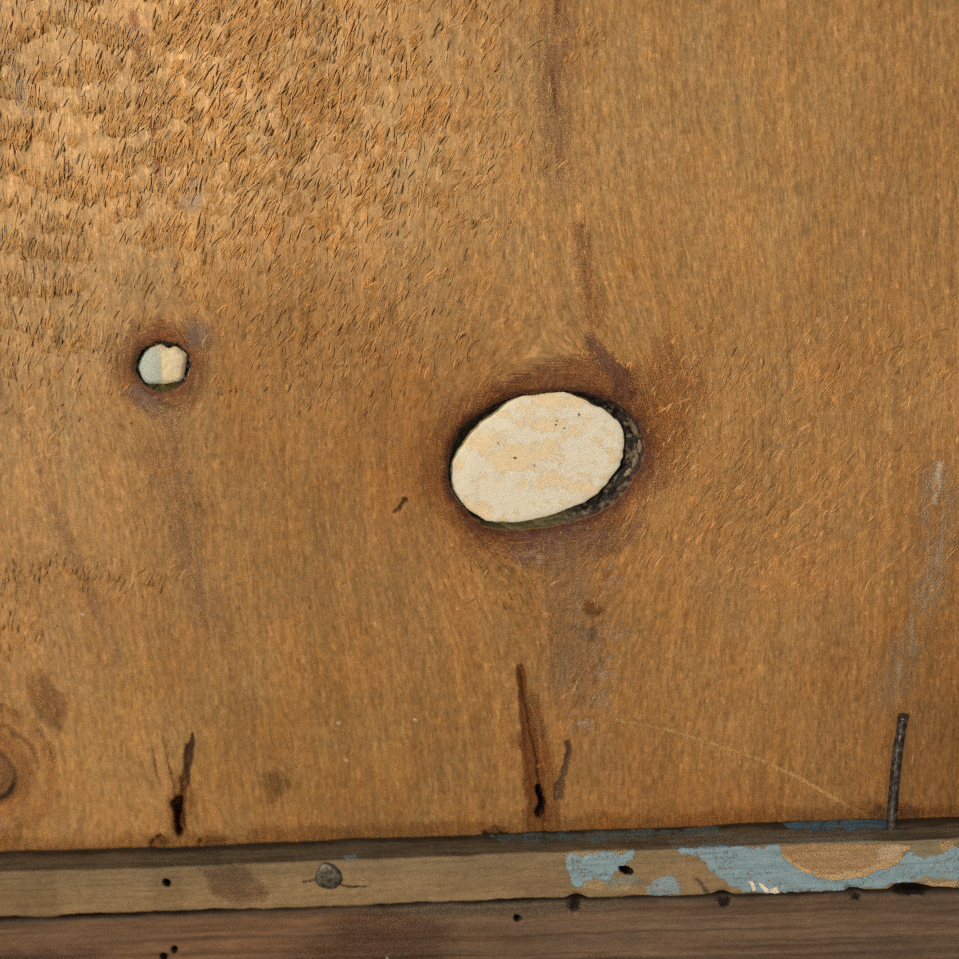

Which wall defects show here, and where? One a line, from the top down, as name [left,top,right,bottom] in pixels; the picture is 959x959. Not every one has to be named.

peeling [749,881,780,894]
peeling [894,883,924,895]